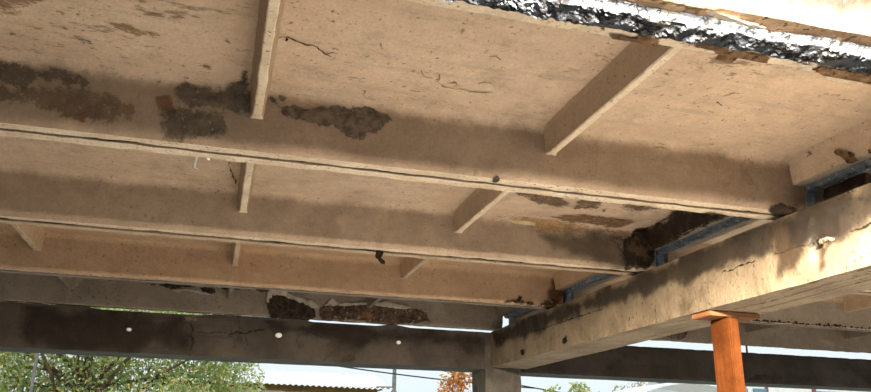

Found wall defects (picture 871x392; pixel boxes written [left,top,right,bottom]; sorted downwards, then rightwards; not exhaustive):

spalling [651,0,766,29]
crack [279,36,338,57]
water stain [0,61,134,124]
water stain [156,71,251,143]
water stain [493,187,871,346]
spalling [150,283,239,296]
spalling [256,290,430,325]